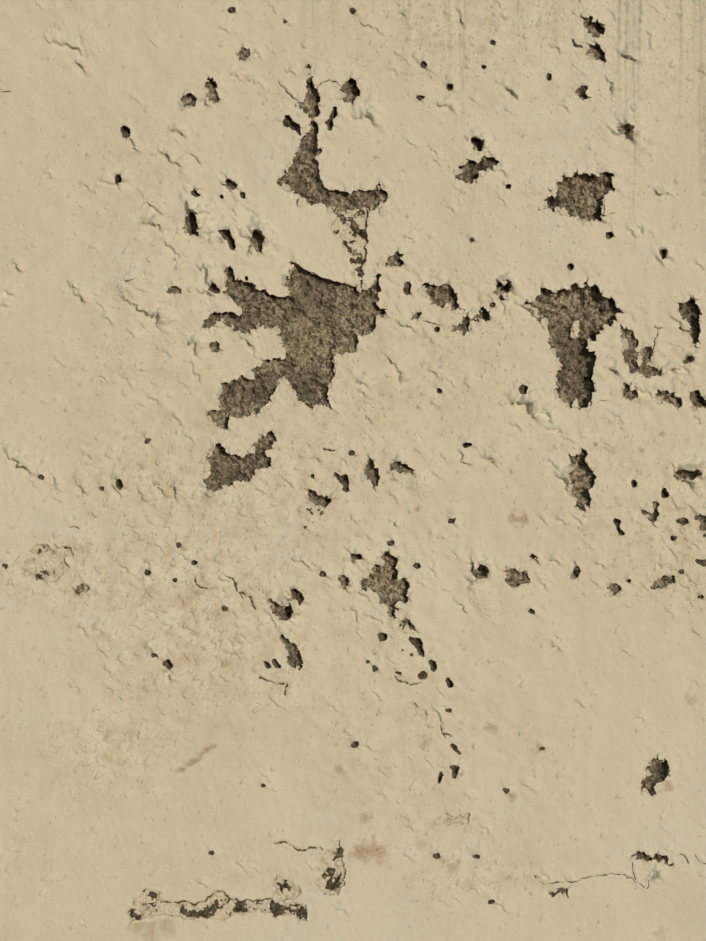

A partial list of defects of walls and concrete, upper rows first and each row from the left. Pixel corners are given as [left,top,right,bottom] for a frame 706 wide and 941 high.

spalling [184,65,646,503]
peeling [653,246,675,266]
spalling [661,294,705,375]
peeling [608,361,662,404]
spalling [556,448,601,513]
peeling [662,462,706,509]
spalling [292,518,439,666]
peeling [456,552,582,613]
peeling [643,505,706,600]
spalling [640,752,674,796]
peeling [128,874,310,923]
peeling [314,840,349,896]